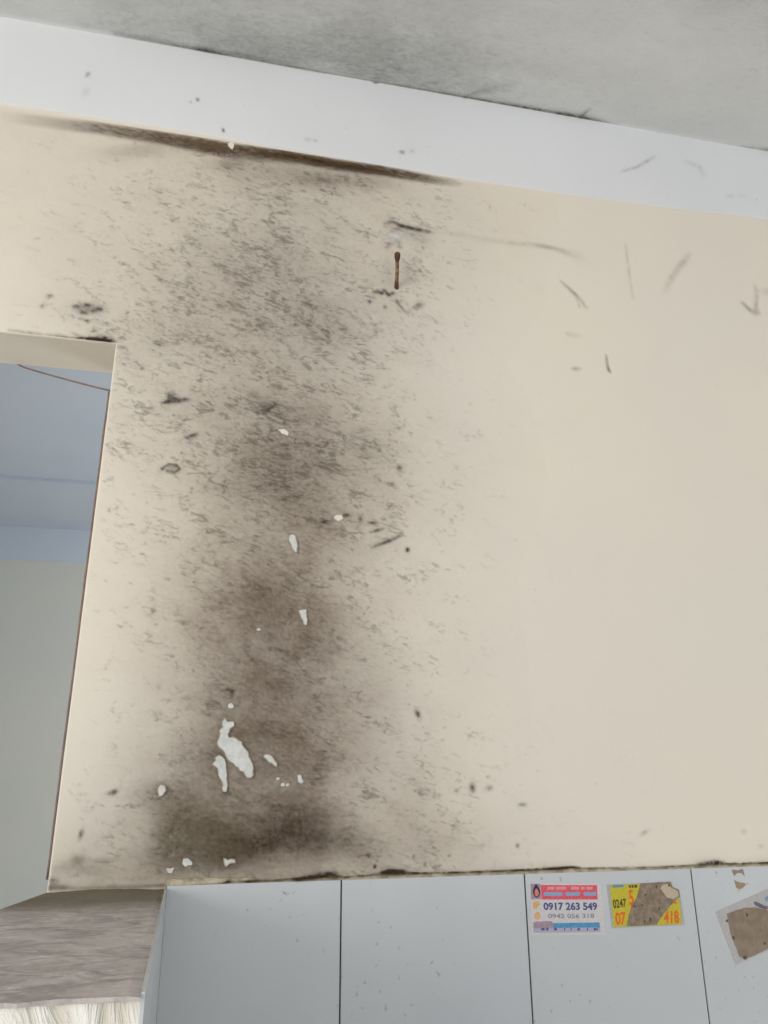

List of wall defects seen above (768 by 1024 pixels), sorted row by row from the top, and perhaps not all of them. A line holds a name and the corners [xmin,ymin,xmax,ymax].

water stain [93,125,434,180]
peeling [288,533,298,553]
peeling [298,609,308,626]
peeling [212,703,303,792]
water stain [186,721,332,868]